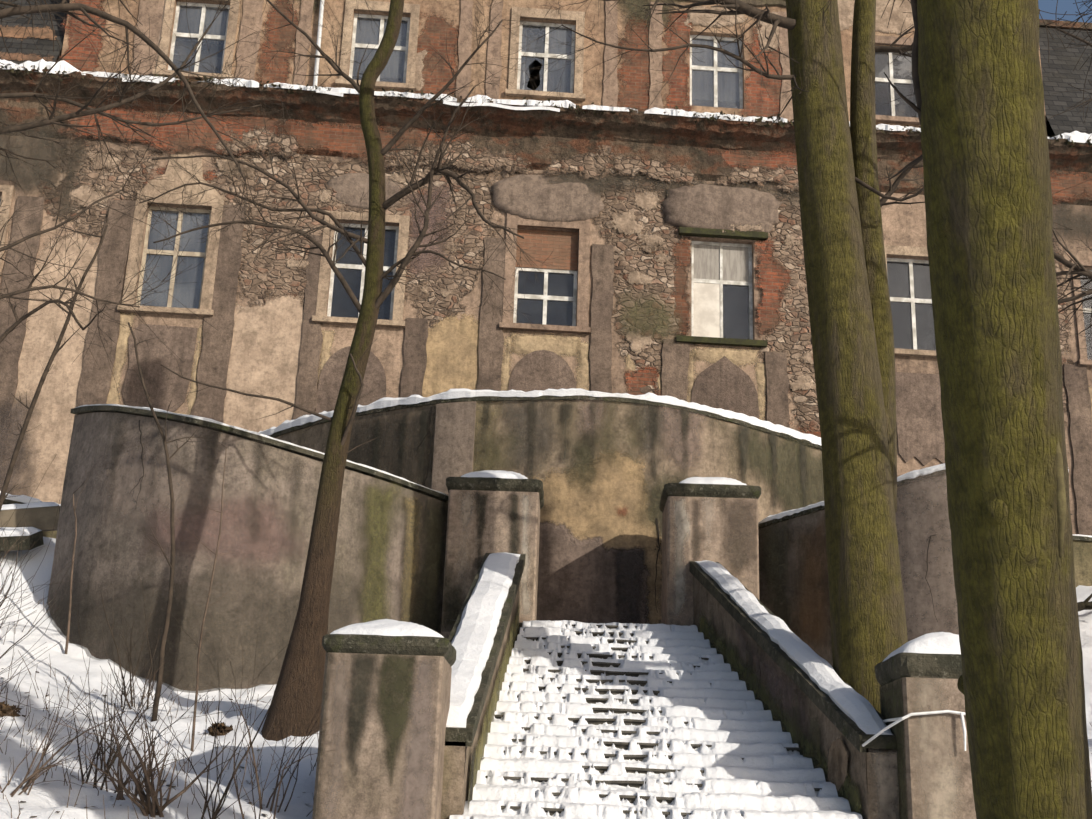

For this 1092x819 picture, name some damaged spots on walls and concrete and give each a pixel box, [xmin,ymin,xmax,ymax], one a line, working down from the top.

flaking render [61,0,107,72]
flaking render [409,12,459,95]
flaking render [617,5,783,117]
peeling [13,106,369,504]
flaking render [379,126,821,437]
leakage [101,420,294,561]
leakage [347,407,435,484]
leakage [735,424,824,510]
leakage [510,494,530,614]
crack [653,518,661,613]
leakage [48,576,300,693]
leakage [317,654,432,819]